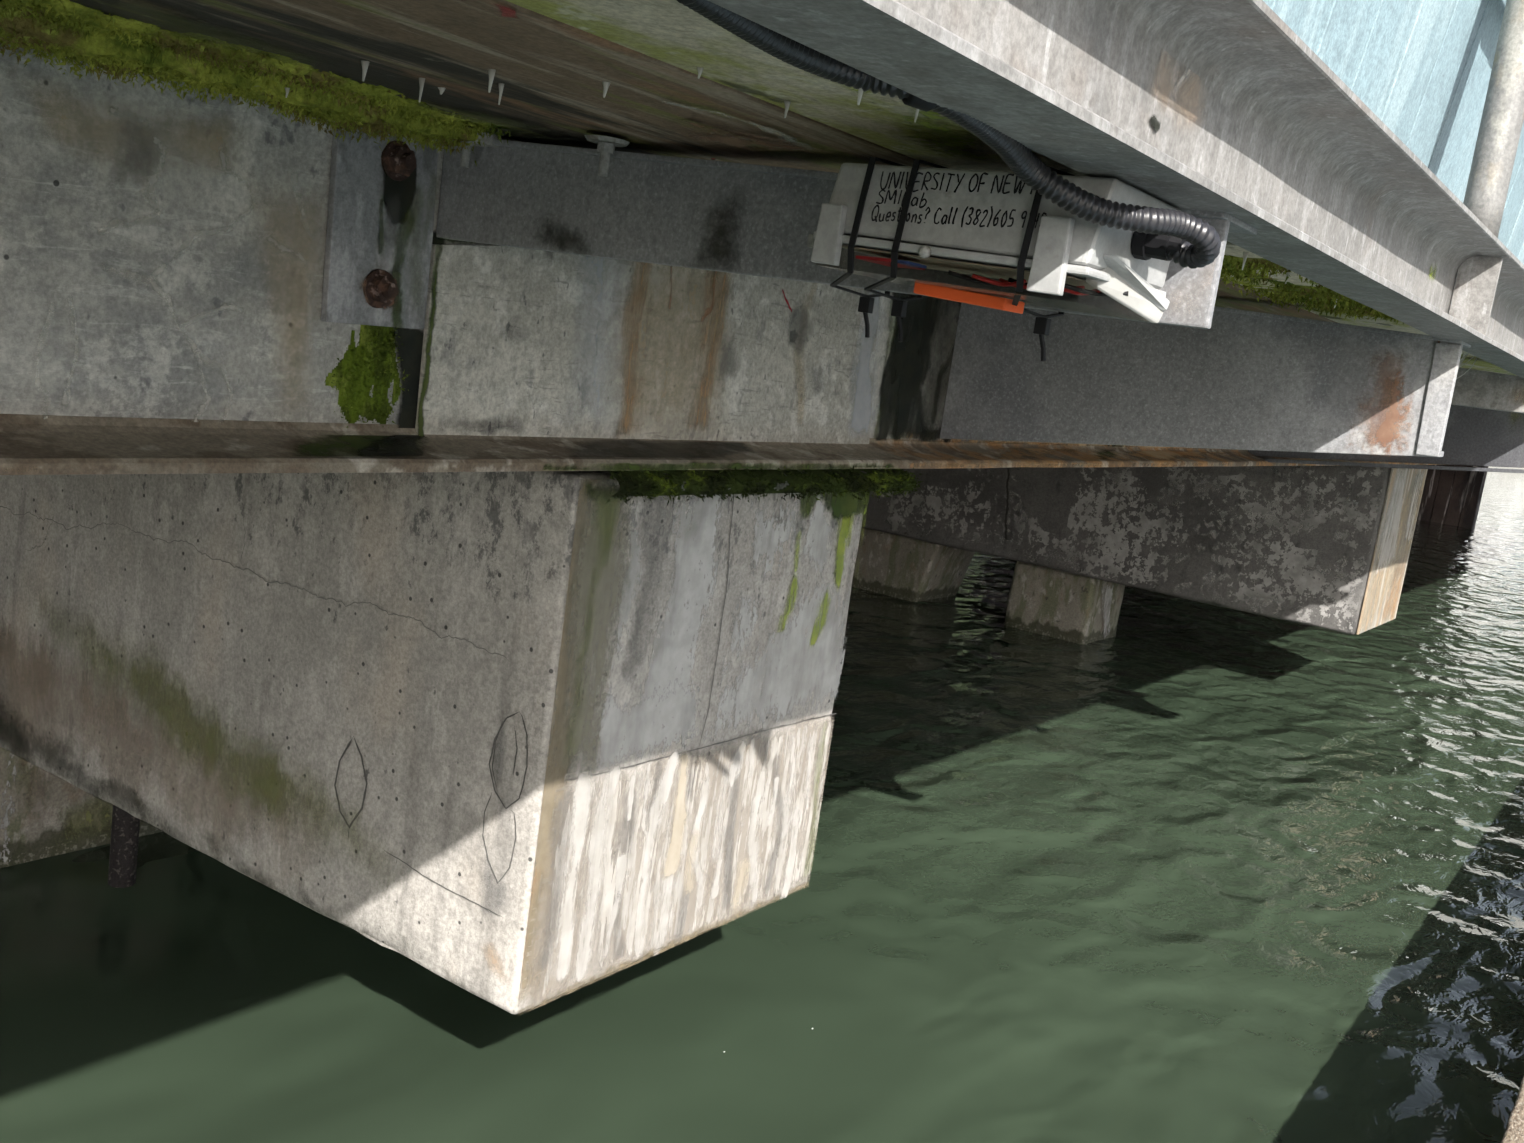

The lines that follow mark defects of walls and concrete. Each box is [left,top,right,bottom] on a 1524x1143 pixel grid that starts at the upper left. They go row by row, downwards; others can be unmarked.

rust [1363,353,1411,453]
damp [0,700,168,834]
damp [519,479,868,1000]